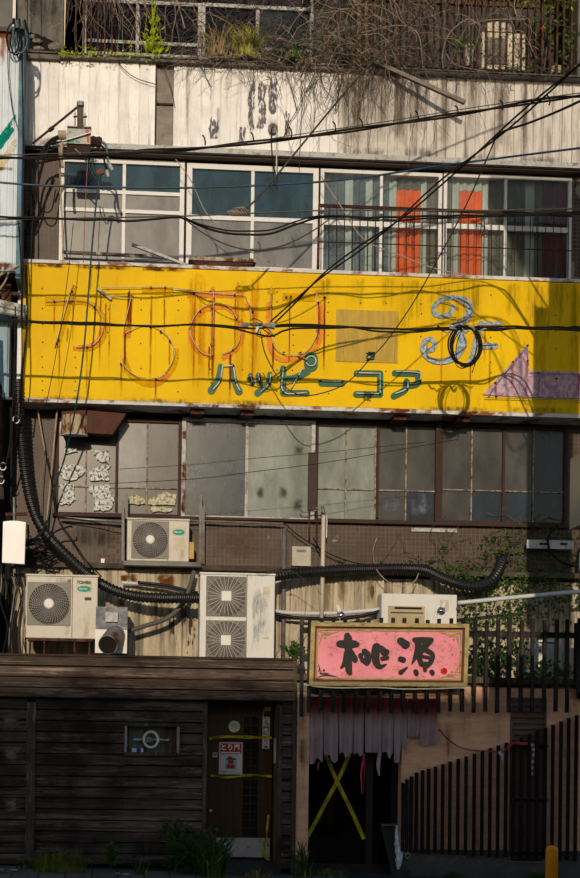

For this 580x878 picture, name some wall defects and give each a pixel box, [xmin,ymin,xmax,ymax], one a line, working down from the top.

rust [0,33,15,56]
leakage [343,74,361,125]
leakage [395,78,421,131]
rust [120,290,132,378]
rust [192,306,214,377]